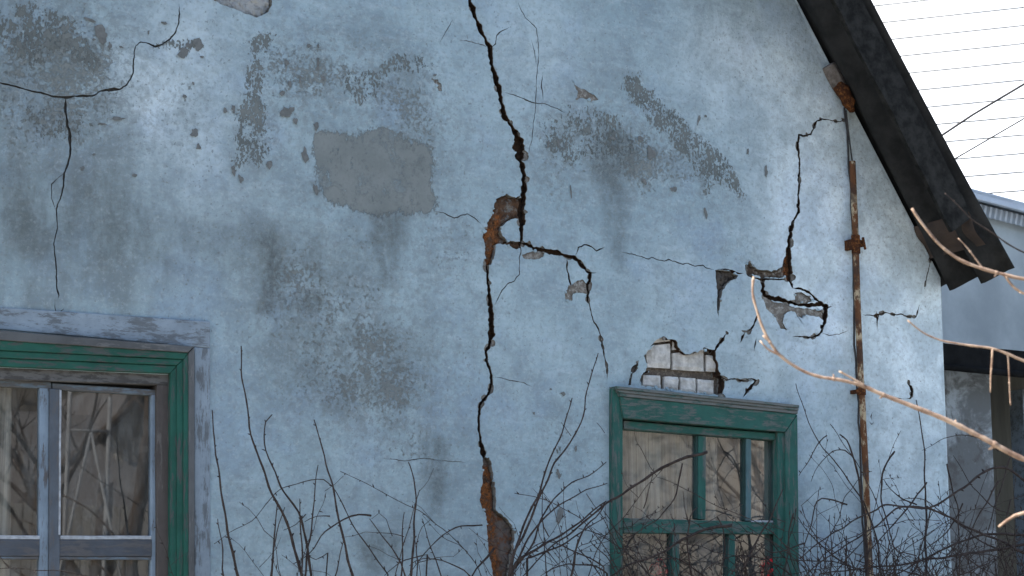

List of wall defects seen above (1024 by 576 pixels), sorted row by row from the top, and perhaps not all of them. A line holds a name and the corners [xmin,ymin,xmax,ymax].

spalling [214,0,272,17]
crack [0,7,180,311]
peeling [301,122,438,218]
peeling [544,81,656,166]
peeling [620,71,747,219]
rust [483,213,500,265]
crack [384,0,847,462]
spalling [715,261,786,316]
spalling [762,292,824,330]
crack [869,259,931,331]
spalling [628,336,720,396]
rust [480,466,499,576]